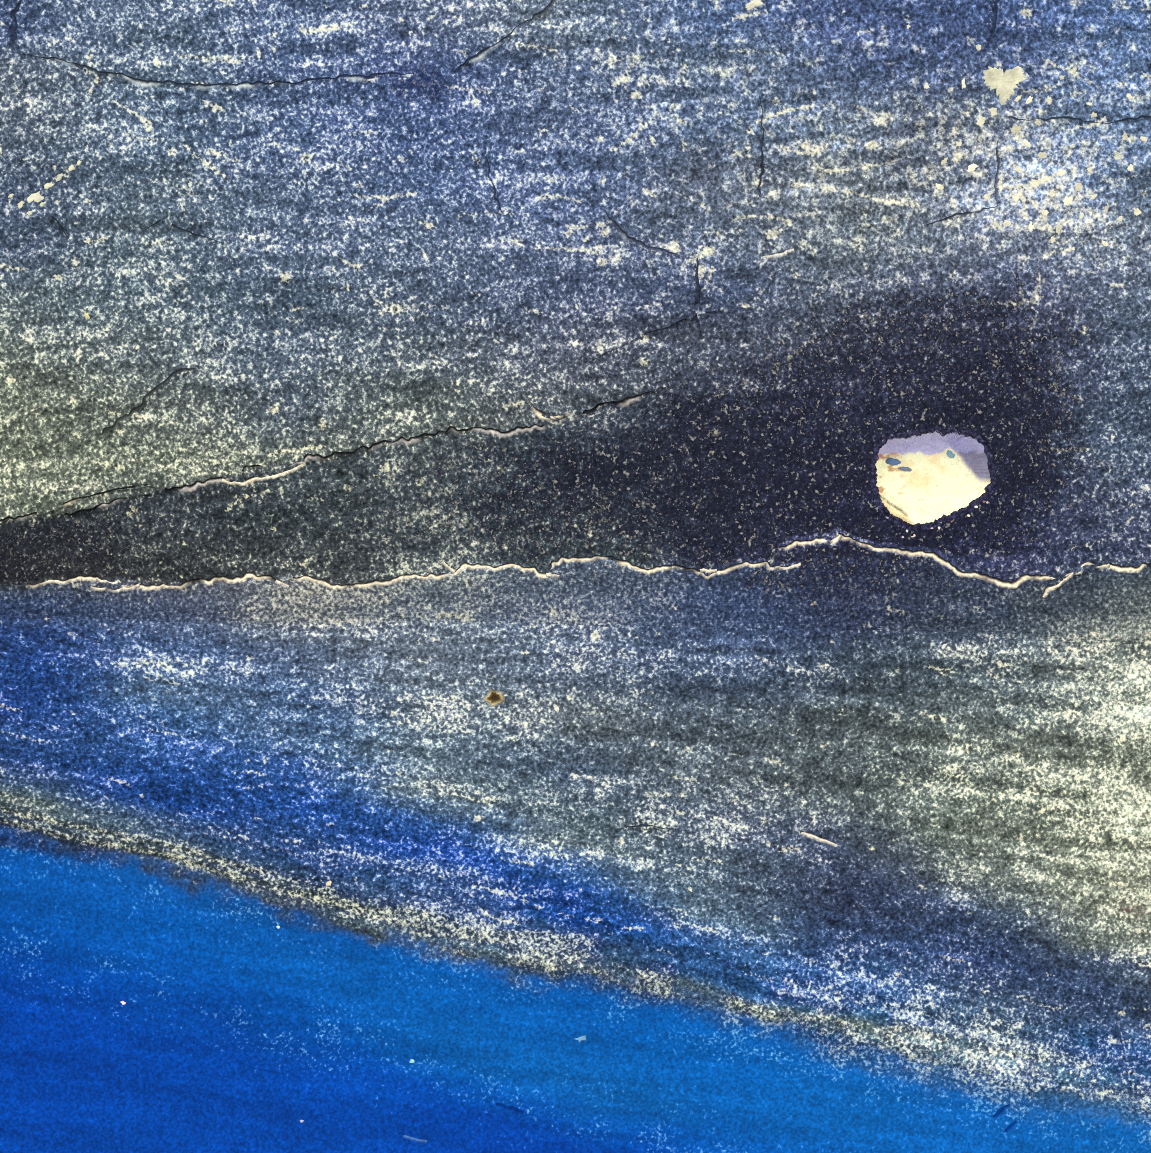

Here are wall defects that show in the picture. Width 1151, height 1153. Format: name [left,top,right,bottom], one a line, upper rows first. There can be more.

crack [5,0,414,93]
crack [48,212,73,242]
crack [584,204,717,368]
crack [97,363,198,439]
crack [0,381,671,528]
spalling [869,425,998,538]
crack [23,528,1151,599]